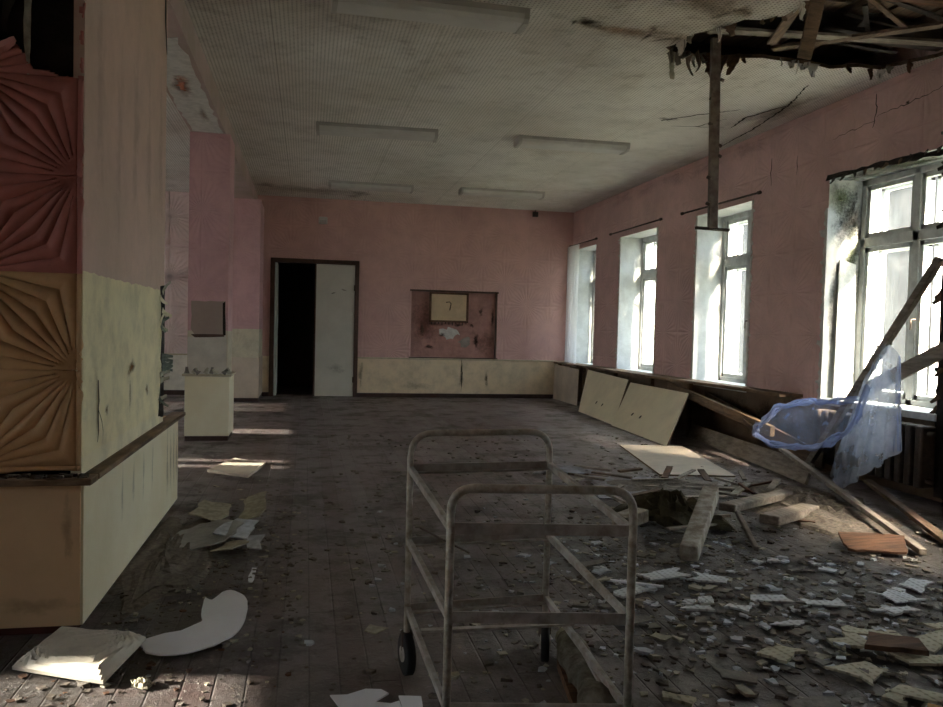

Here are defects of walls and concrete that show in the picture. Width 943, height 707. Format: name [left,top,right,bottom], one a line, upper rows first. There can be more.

peeling [667,35,694,66]
crack [839,86,942,136]